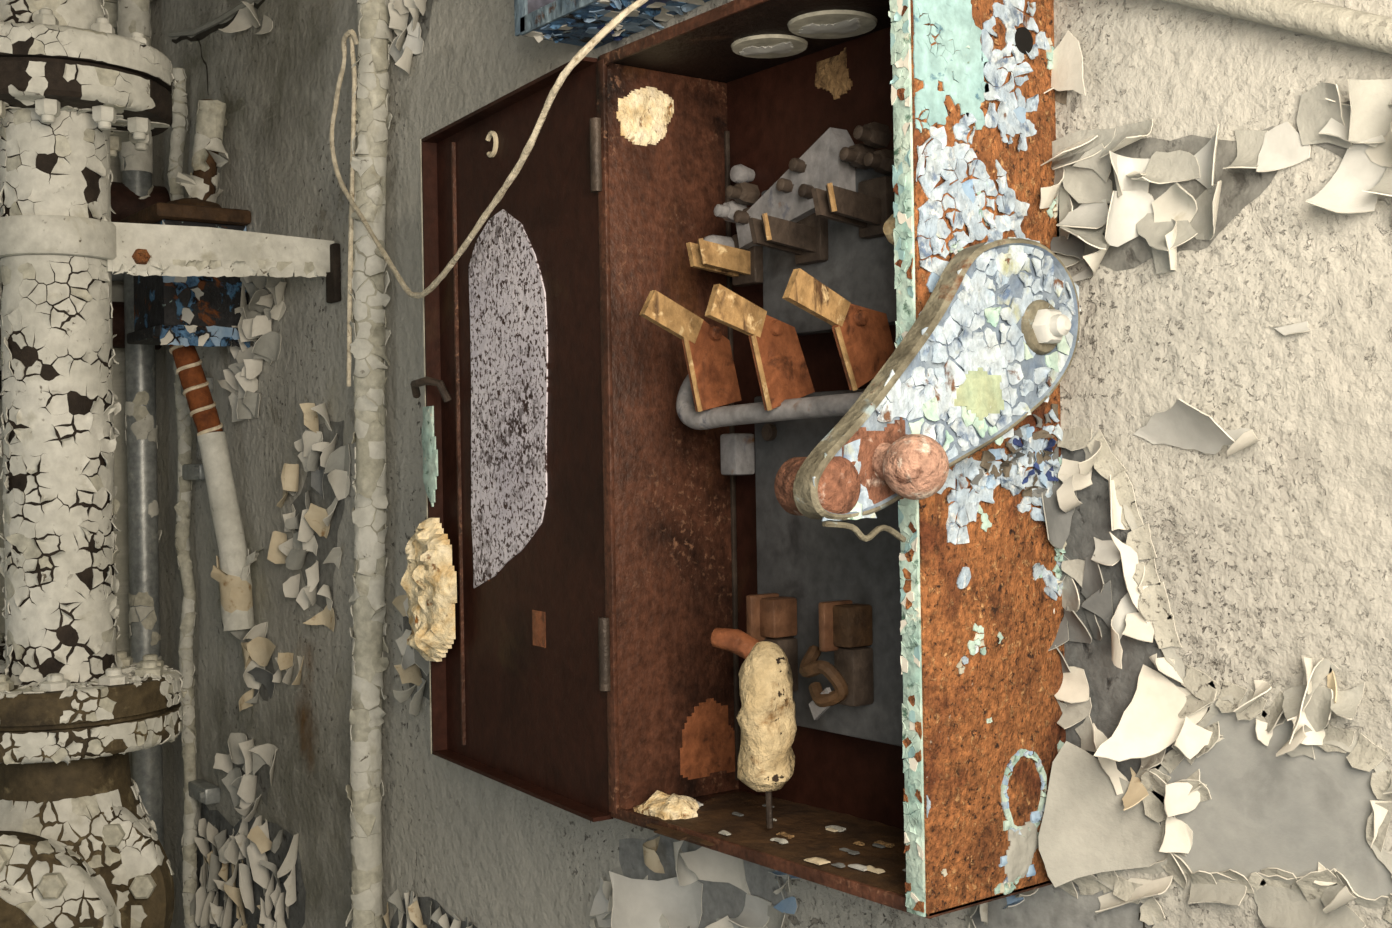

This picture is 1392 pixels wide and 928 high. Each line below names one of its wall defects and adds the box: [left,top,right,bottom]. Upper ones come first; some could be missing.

peeling [116,0,151,46]
peeling [119,69,228,203]
peeling [1044,30,1086,104]
peeling [1039,79,1392,282]
peeling [112,259,326,422]
peeling [148,361,193,570]
peeling [211,0,477,928]
peeling [1133,398,1261,456]
peeling [128,592,197,759]
peeling [965,428,1392,928]
peeling [181,733,306,928]
peeling [589,834,802,928]